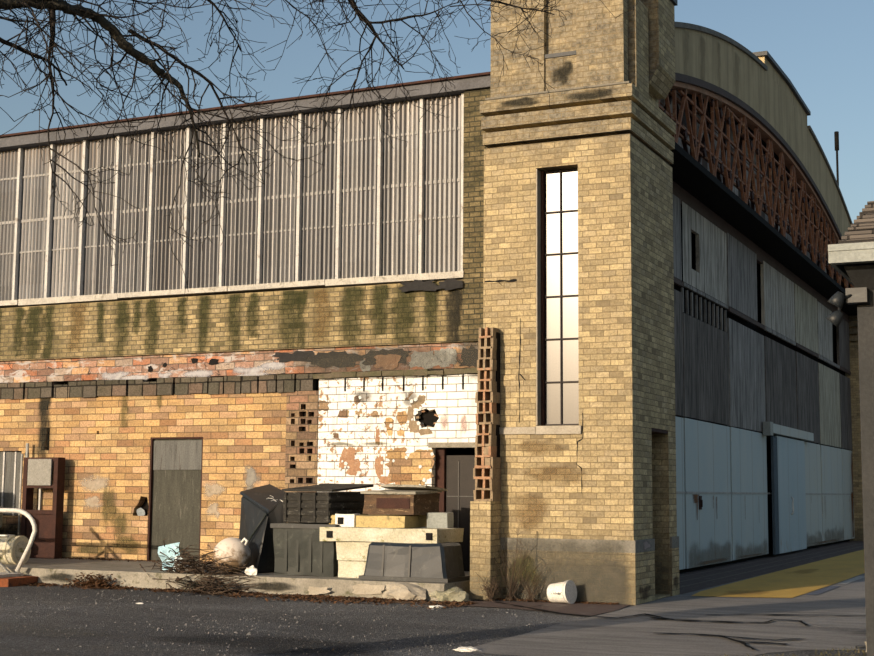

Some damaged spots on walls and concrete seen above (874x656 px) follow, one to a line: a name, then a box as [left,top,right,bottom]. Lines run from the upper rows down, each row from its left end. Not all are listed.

water stain [15,306,54,359]
water stain [116,299,159,356]
water stain [177,297,187,333]
water stain [199,296,209,352]
water stain [229,294,259,349]
water stain [279,290,307,348]
water stain [341,285,415,344]
peeling [409,348,457,369]
water stain [425,282,463,343]
peeling [318,395,438,485]
crack [576,413,584,493]